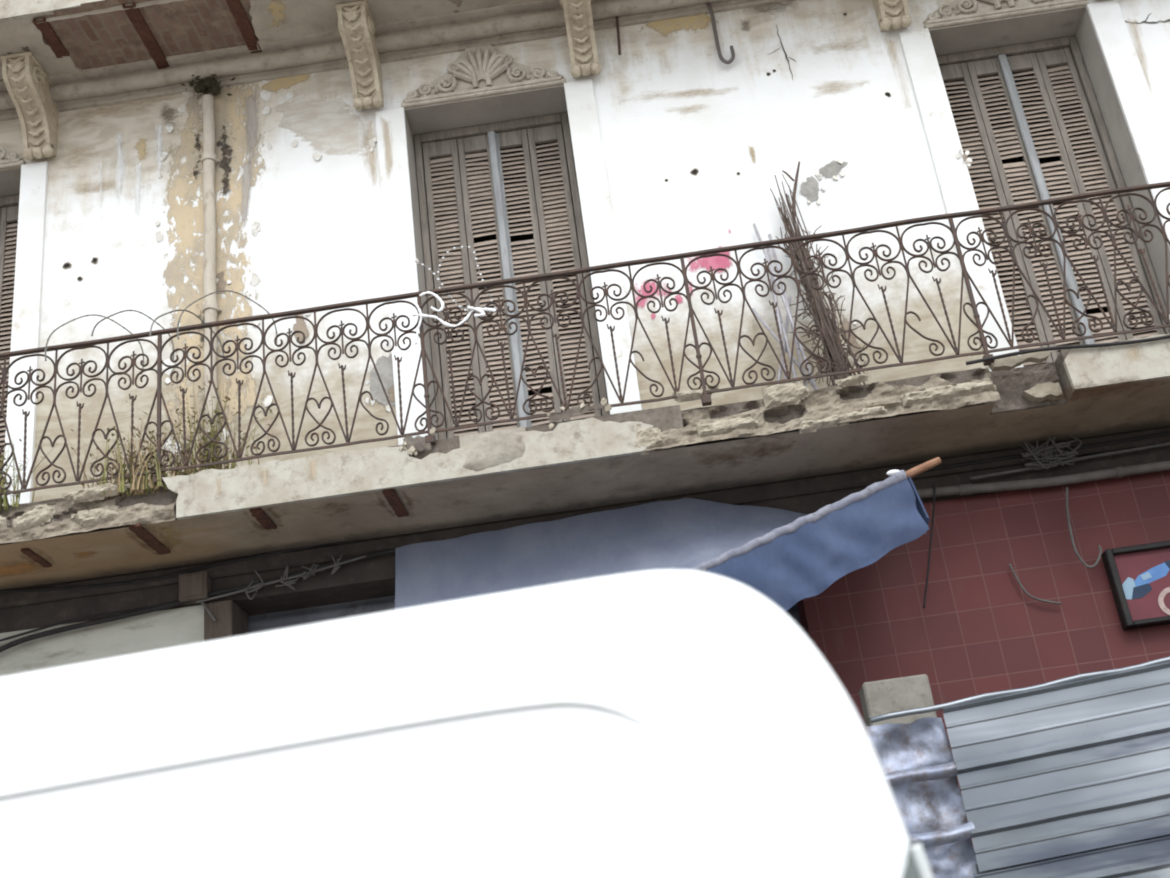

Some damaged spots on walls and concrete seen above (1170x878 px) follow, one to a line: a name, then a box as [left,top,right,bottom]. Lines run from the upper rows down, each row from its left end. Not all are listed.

peeling [637,14,720,36]
crack [1125,13,1170,24]
crack [772,25,796,79]
leakage [193,134,201,183]
peeling [155,73,377,455]
spalling [635,315,1066,455]
spalling [547,398,612,429]
spalling [399,427,436,455]
spalling [0,482,176,568]